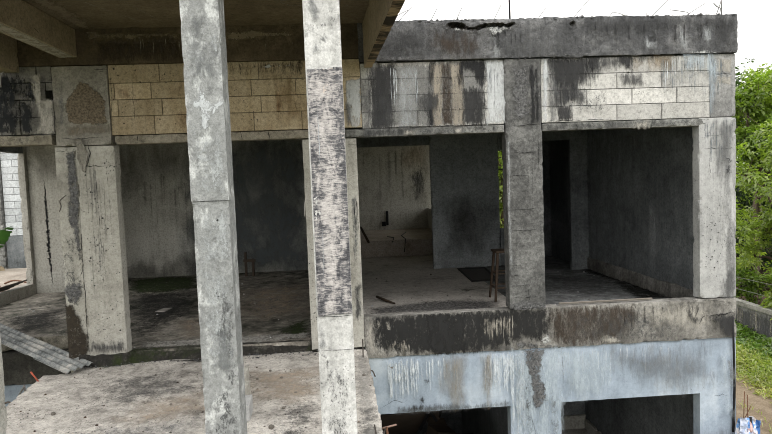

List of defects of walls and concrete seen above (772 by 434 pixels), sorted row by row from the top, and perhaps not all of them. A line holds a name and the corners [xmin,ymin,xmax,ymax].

spalling [454,5,511,35]
spalling [633,0,722,17]
damp [0,73,44,144]
spalling [65,82,107,125]
damp [368,31,506,136]
damp [529,56,646,131]
damp [663,55,722,90]
damp [249,344,348,406]
spalling [517,335,561,408]
damp [355,269,772,434]
damp [285,404,315,434]